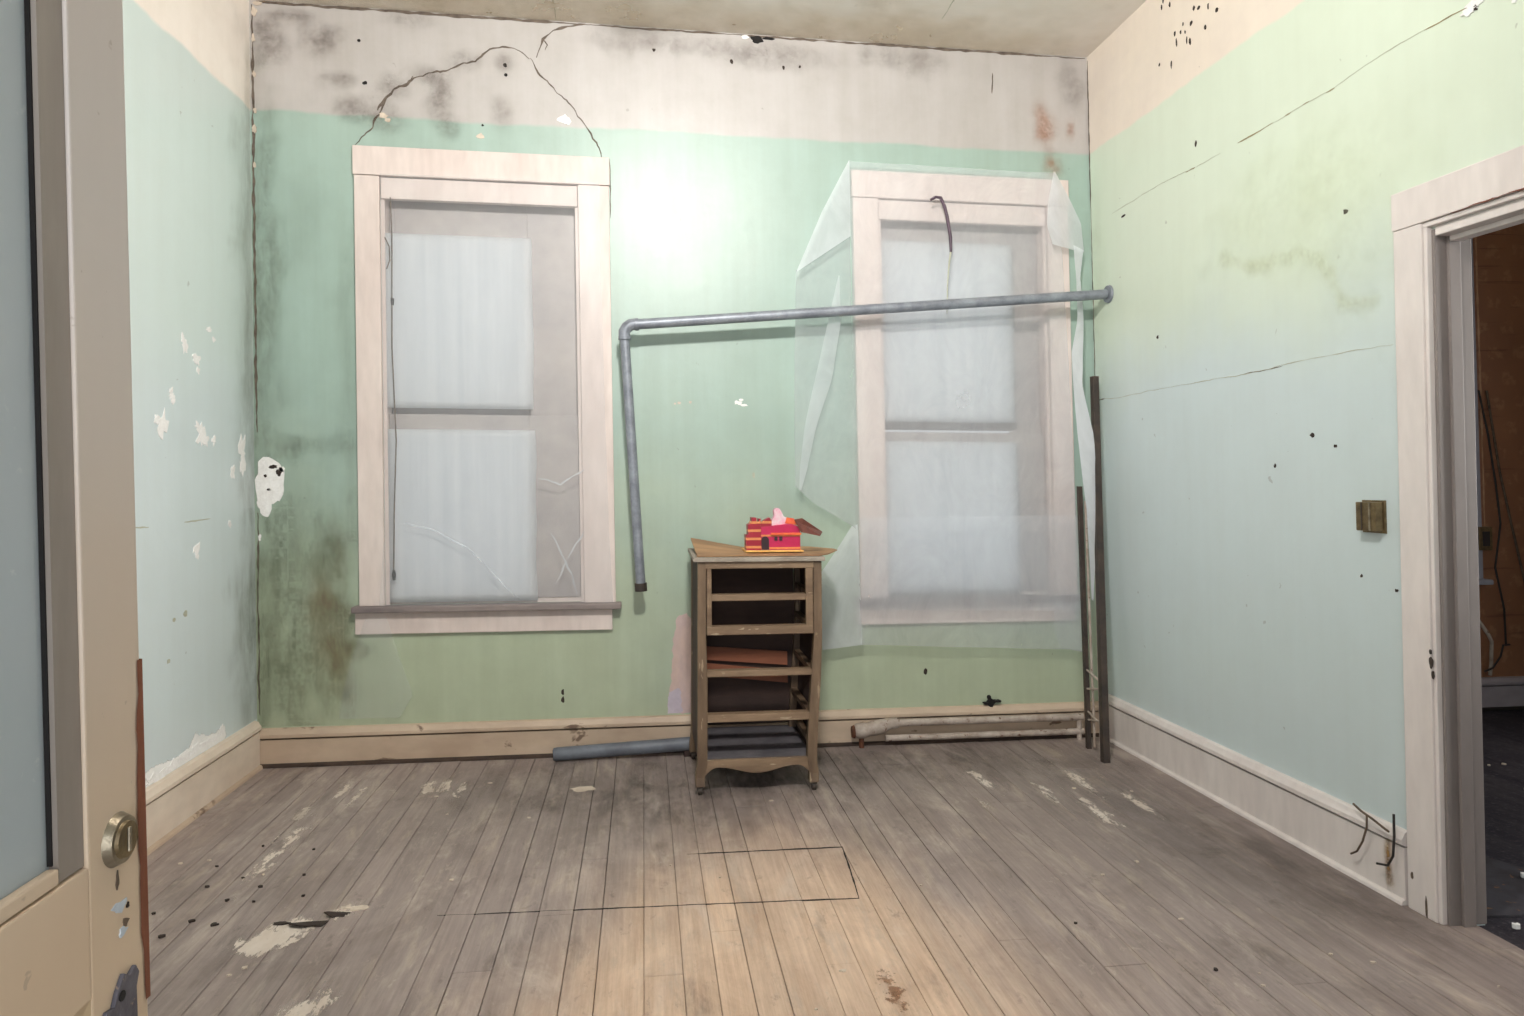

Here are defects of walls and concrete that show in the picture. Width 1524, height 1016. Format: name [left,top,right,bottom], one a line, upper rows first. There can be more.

flaking render [1460,0,1485,17]
crack [251,0,1466,432]
peeling [154,387,176,440]
peeling [195,421,216,447]
peeling [230,435,285,517]
crack [254,513,262,715]